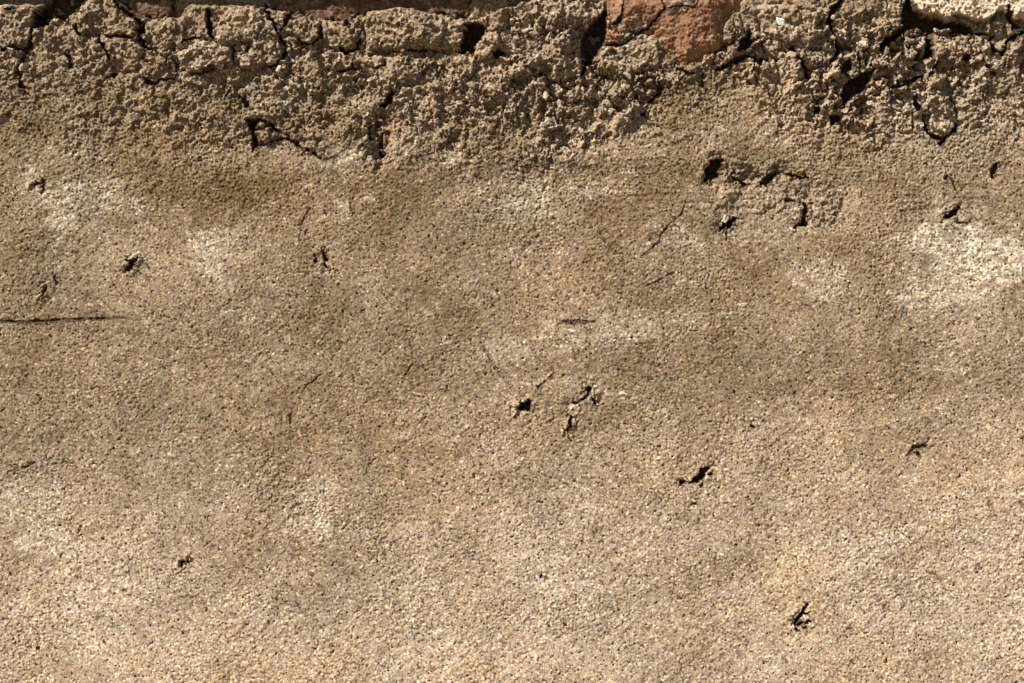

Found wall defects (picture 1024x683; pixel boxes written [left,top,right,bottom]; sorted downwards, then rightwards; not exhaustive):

spalling [0,0,1024,166]
crack [606,0,699,47]
crack [640,0,864,116]
crack [890,78,959,147]
crack [963,4,1024,80]